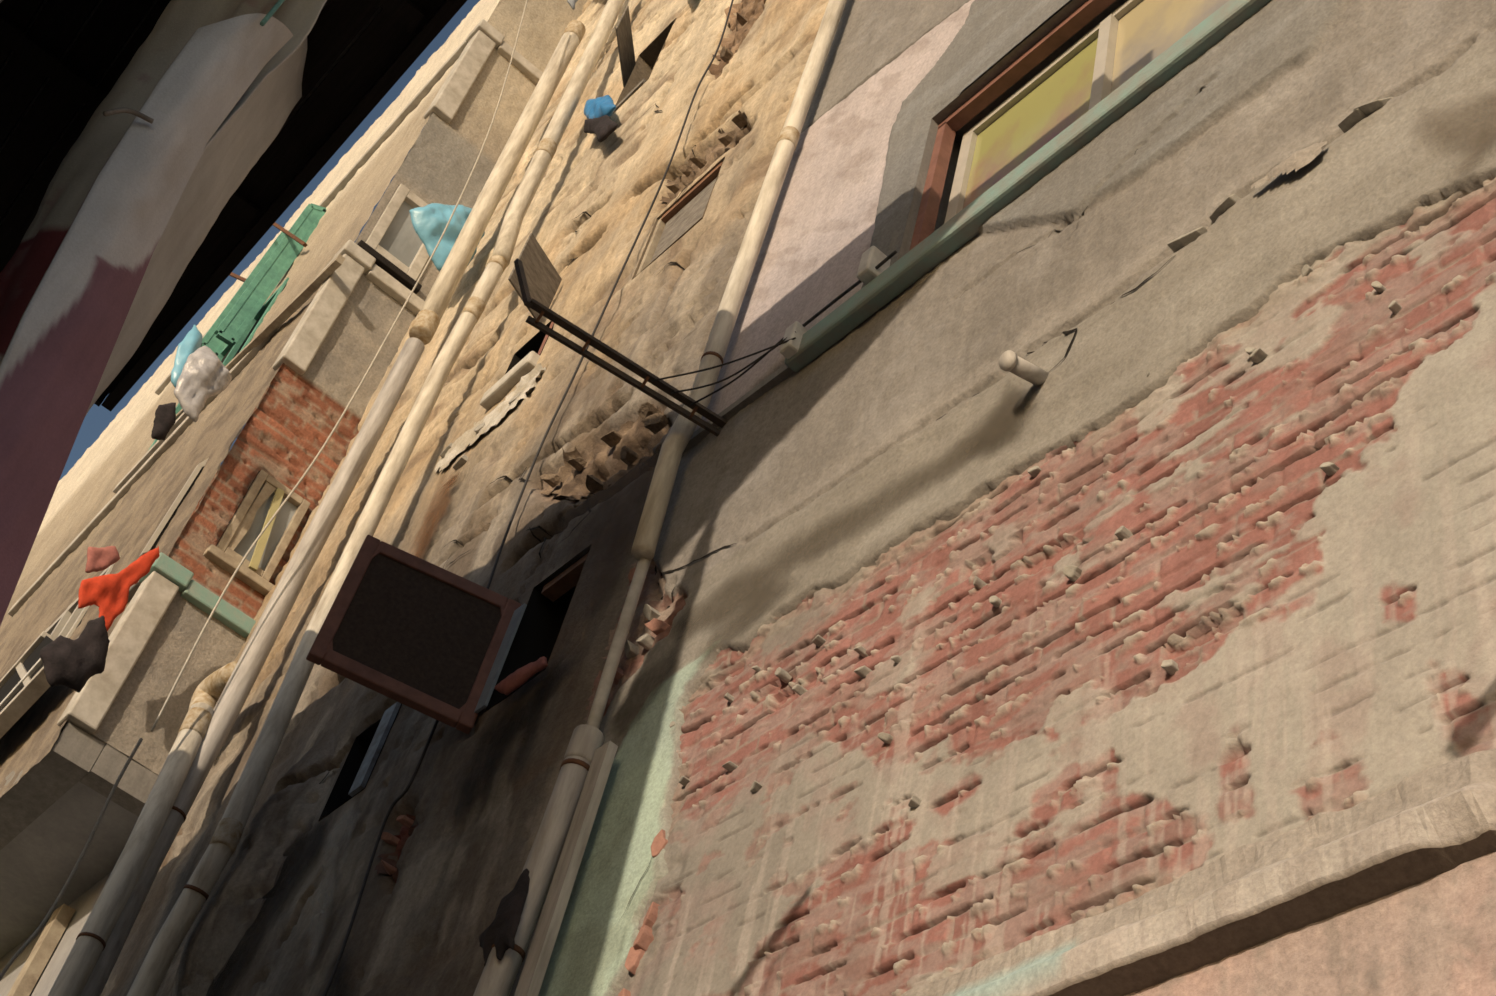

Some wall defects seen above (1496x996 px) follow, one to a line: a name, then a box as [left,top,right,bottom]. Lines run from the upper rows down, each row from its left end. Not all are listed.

flaking render [709,0,766,79]
flaking render [1338,97,1394,133]
crack [1016,206,1088,254]
flaking render [1167,141,1327,253]
crack [1111,255,1176,304]
flaking render [540,402,671,503]
crack [655,543,737,609]
flaking render [614,177,1496,996]
flaking render [583,559,686,724]